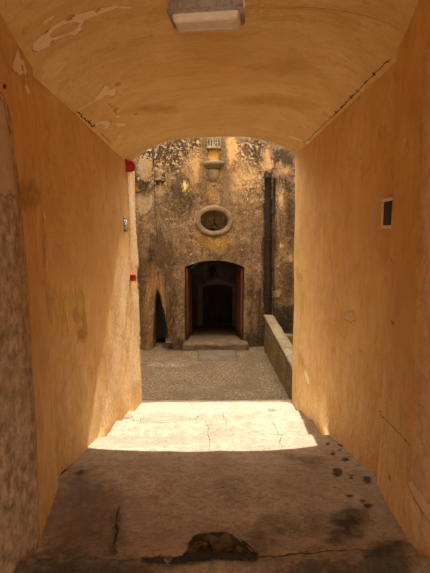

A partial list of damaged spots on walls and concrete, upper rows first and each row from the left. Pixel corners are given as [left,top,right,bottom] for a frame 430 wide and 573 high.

peeling [32,5,132,51]
crack [304,59,390,144]
damp [134,137,207,351]
damp [222,138,295,347]
crack [109,505,122,555]
spalling [141,532,258,565]
crack [251,545,393,559]
damp [330,509,364,543]